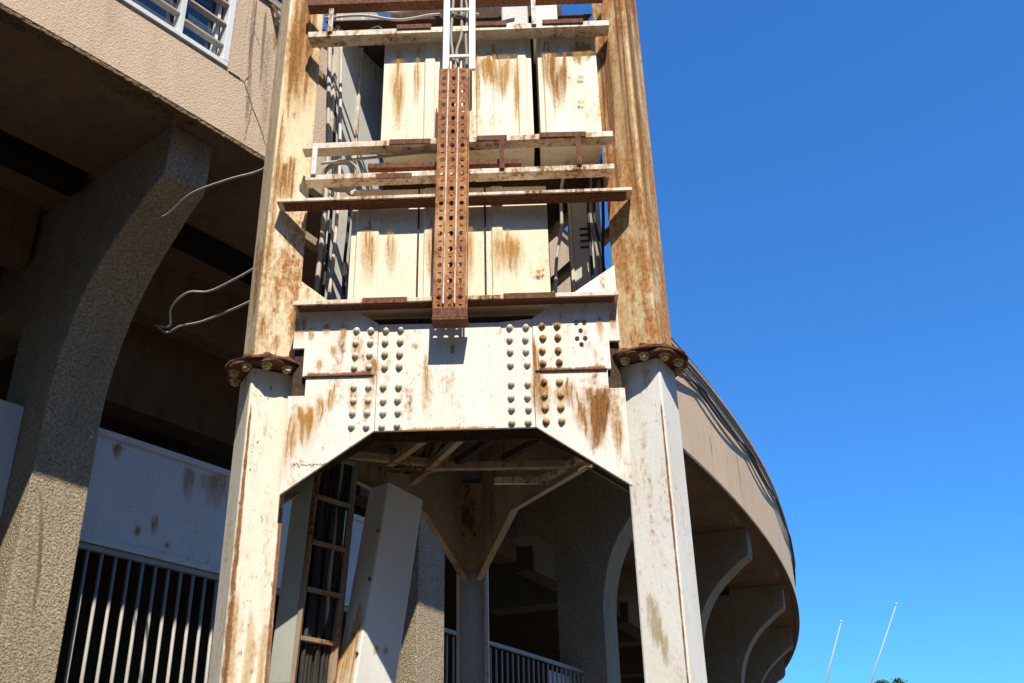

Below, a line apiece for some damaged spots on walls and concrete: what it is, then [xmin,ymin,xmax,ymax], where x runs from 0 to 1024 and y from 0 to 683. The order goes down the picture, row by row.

crack [235,1,278,145]
corrosion [272,0,317,203]
corrosion [476,45,519,111]
corrosion [365,222,373,260]
corrosion [496,231,519,262]
corrosion [286,359,377,451]
corrosion [532,338,622,447]
corrosion [221,406,251,683]
corrosion [245,494,284,683]